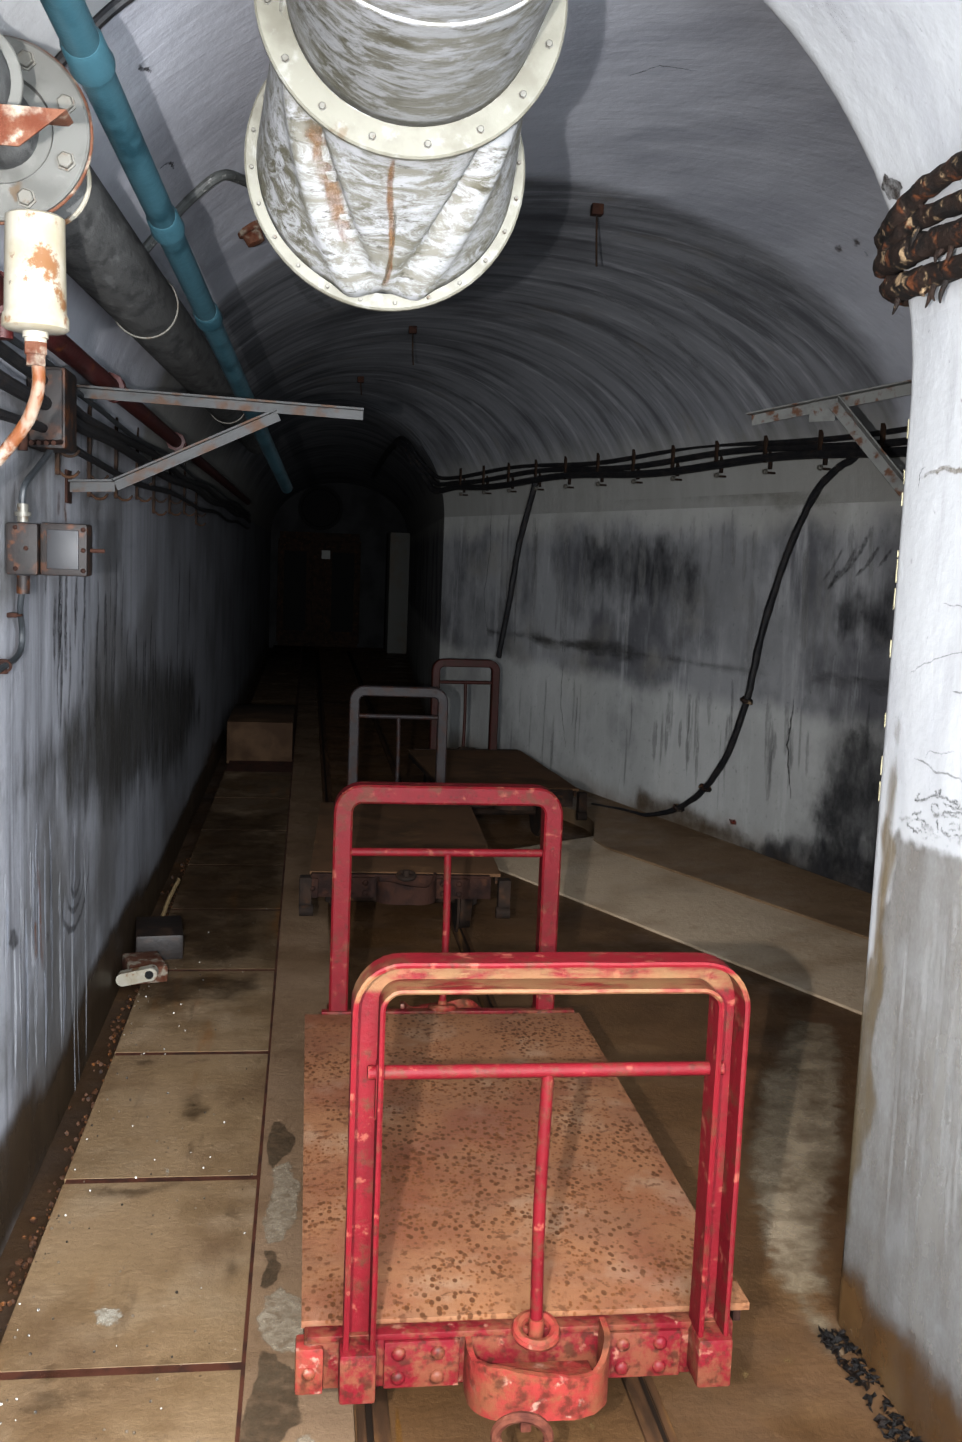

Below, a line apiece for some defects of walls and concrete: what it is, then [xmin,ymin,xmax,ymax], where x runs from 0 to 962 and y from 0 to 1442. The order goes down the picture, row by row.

damp [591,542,695,597]
damp [534,636,597,650]
damp [840,596,894,633]
damp [40,576,200,809]
crack [907,752,958,836]
damp [0,731,277,1249]
spalling [263,1162,300,1243]
spalling [257,1288,303,1352]